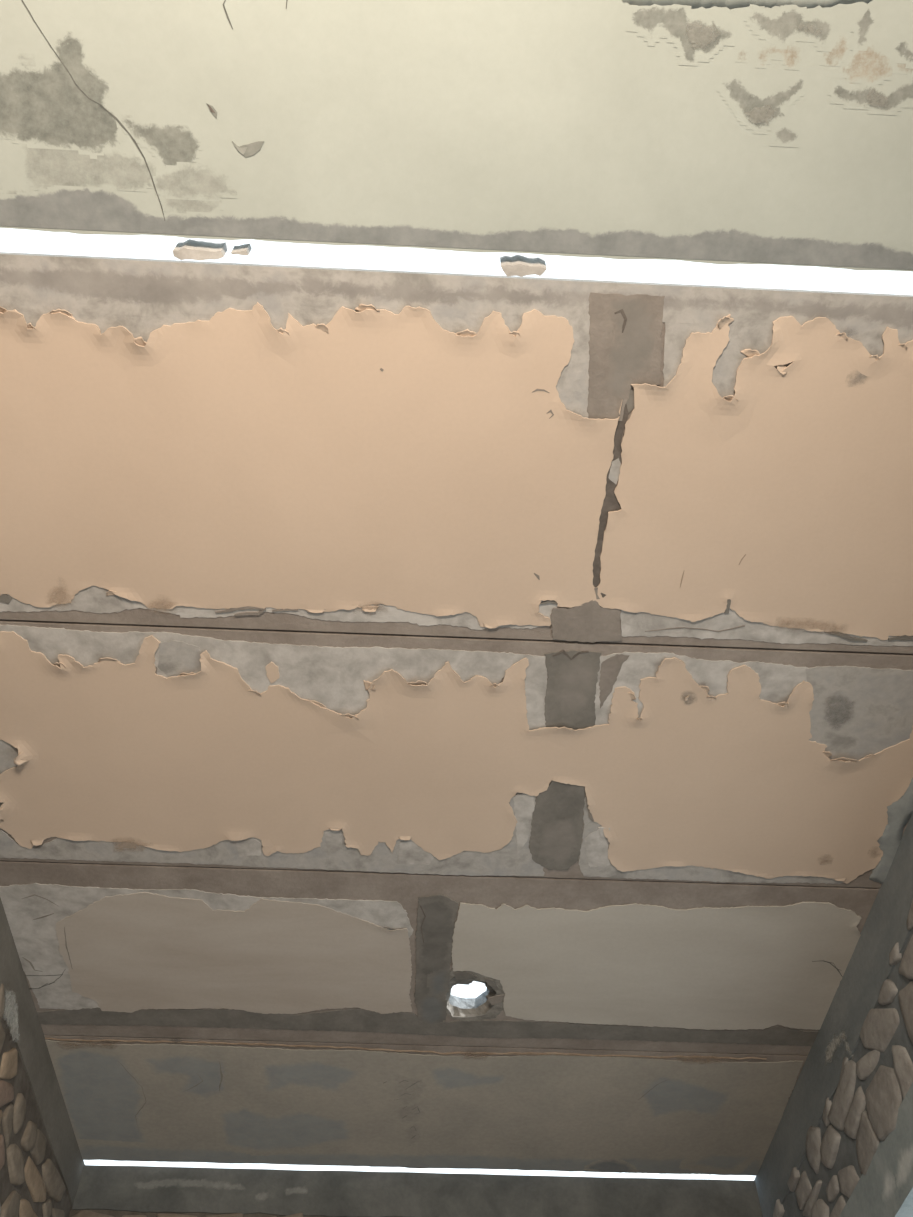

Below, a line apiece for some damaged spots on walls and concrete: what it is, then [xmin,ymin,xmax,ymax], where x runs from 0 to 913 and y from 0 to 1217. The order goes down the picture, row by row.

crack [22,0,165,221]
water stain [0,31,913,270]
peeling [626,4,881,66]
peeling [716,72,808,148]
peeling [828,36,913,115]
peeling [249,304,380,334]
peeling [533,292,792,421]
crack [593,388,634,599]
peeling [0,586,913,761]
peeling [0,740,29,774]
peeling [0,781,847,884]
peeling [0,883,505,1025]